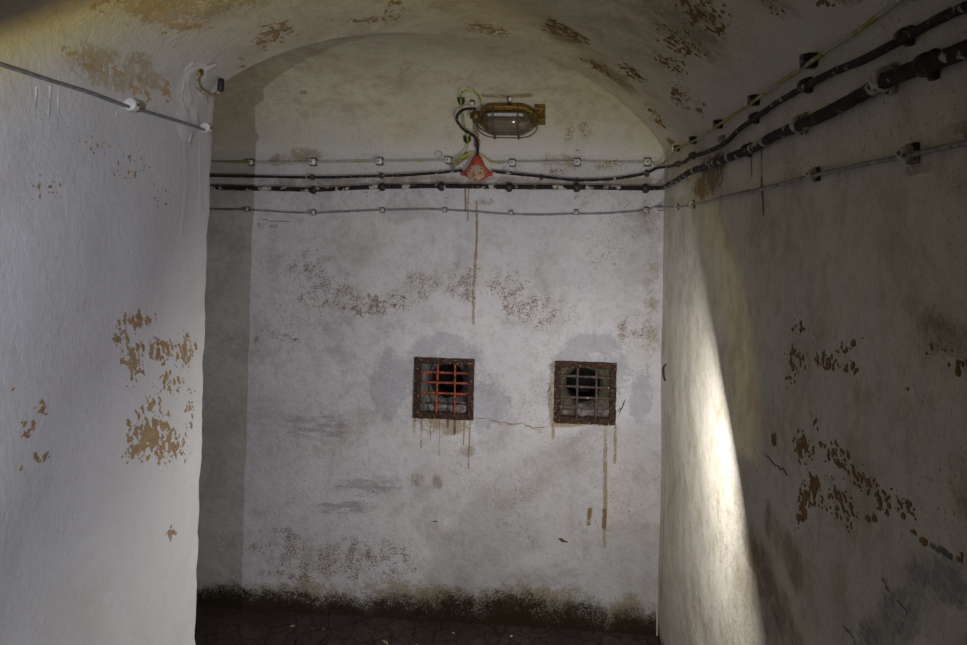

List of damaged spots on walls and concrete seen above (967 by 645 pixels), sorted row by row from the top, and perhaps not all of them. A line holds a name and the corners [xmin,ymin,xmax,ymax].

peeling [60,46,175,103]
peeling [653,0,732,118]
corrosion [286,188,569,329]
peeling [111,307,198,472]
corrosion [413,418,471,468]
crack [474,418,550,433]
corrosion [587,425,617,544]
peeling [784,319,864,389]
peeling [792,413,928,547]
water stain [196,584,661,645]